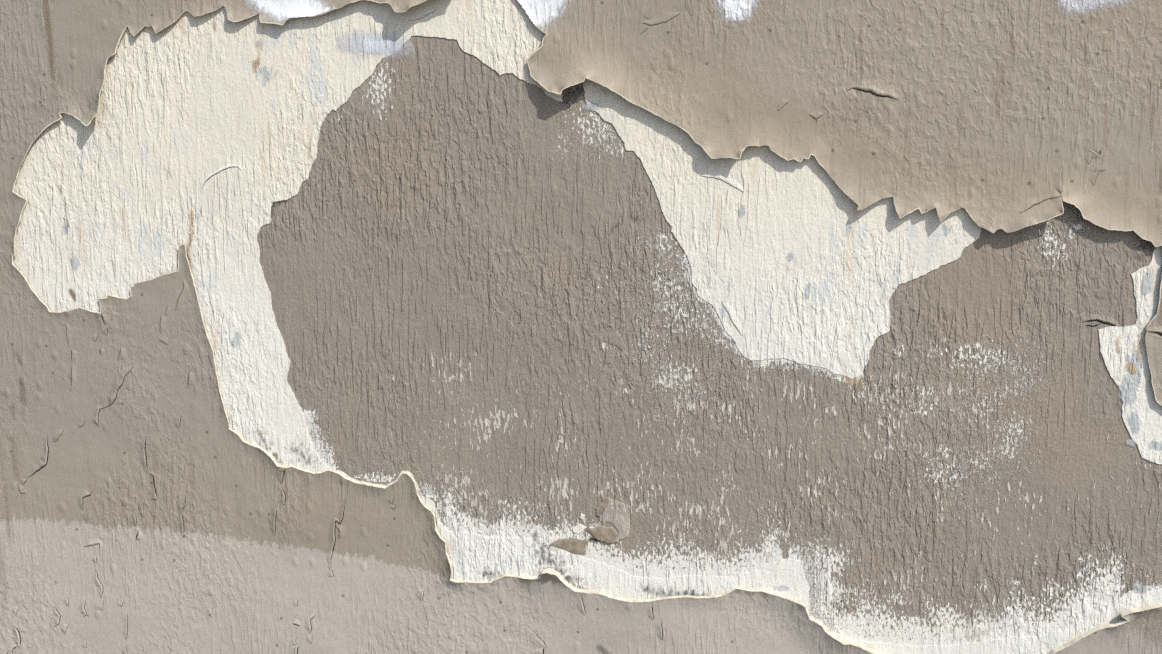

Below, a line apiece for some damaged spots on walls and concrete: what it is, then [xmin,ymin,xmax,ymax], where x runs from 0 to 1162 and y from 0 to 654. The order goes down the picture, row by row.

peeling [1142,269,1152,294]
crack [1082,314,1120,327]
crack [1148,326,1162,339]
crack [18,314,134,494]
crack [130,436,185,540]
crack [268,467,286,535]
crack [53,490,128,654]
crack [326,499,346,577]
peeling [353,474,872,654]
crack [7,606,21,654]
crack [289,599,316,654]
peeling [1049,603,1162,654]